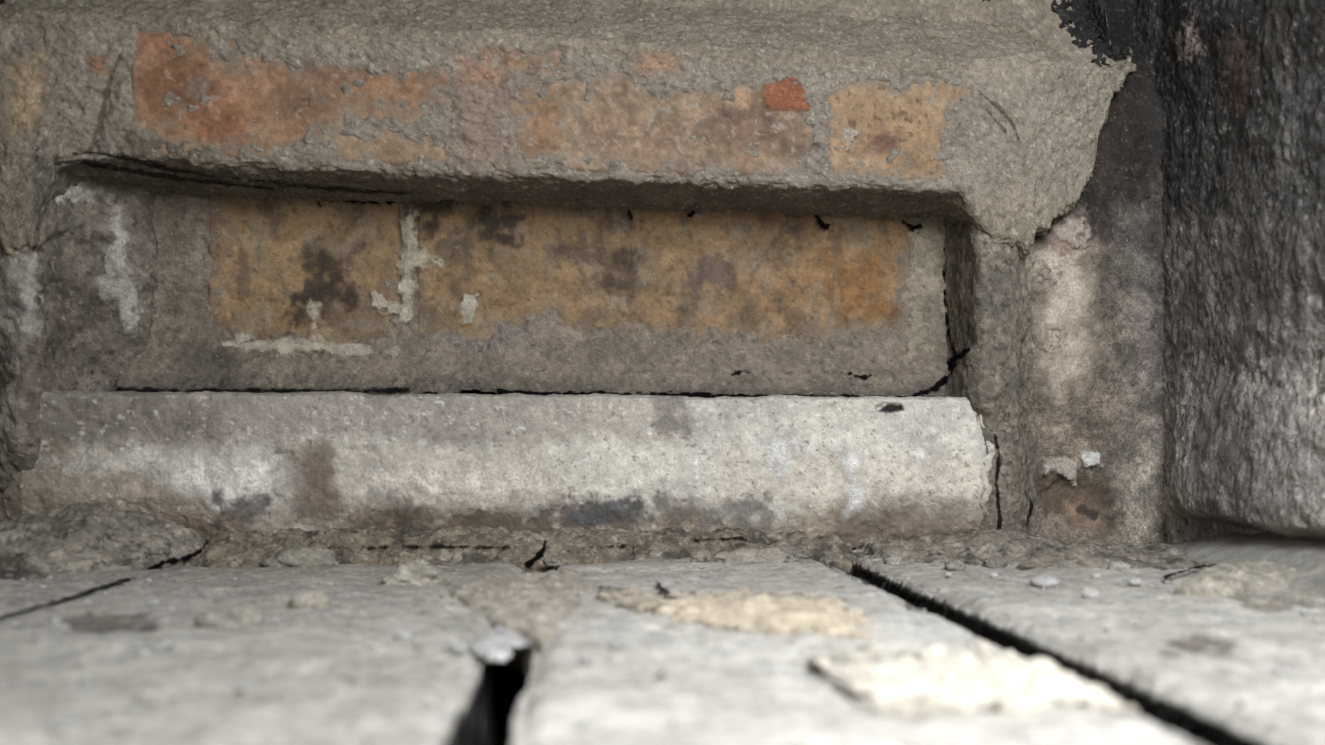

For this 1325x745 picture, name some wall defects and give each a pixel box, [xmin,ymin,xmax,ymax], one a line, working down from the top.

damp [371,209,442,322]
damp [460,294,478,323]
crack [994,434,1034,530]
crack [0,539,208,620]